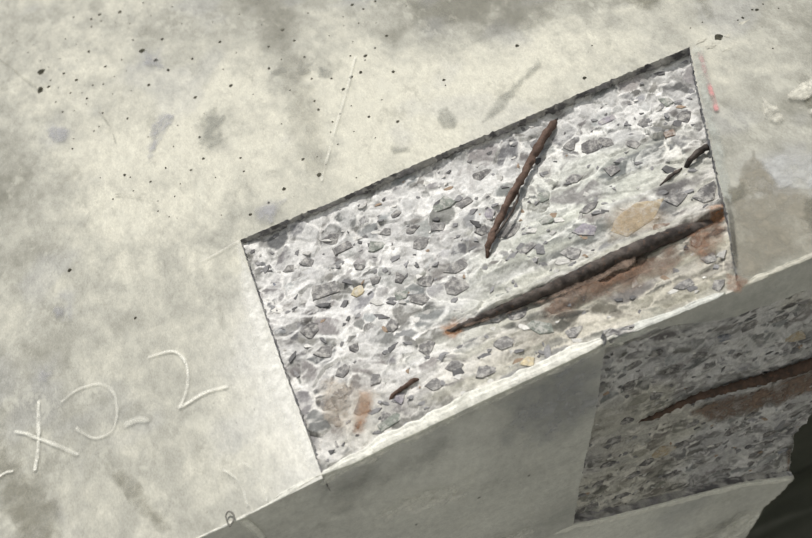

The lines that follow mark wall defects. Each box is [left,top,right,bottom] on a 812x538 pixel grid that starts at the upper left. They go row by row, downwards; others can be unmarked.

rust [689,207,724,257]
spalling [197,34,812,538]
rust [545,245,680,316]
rust [693,372,812,421]